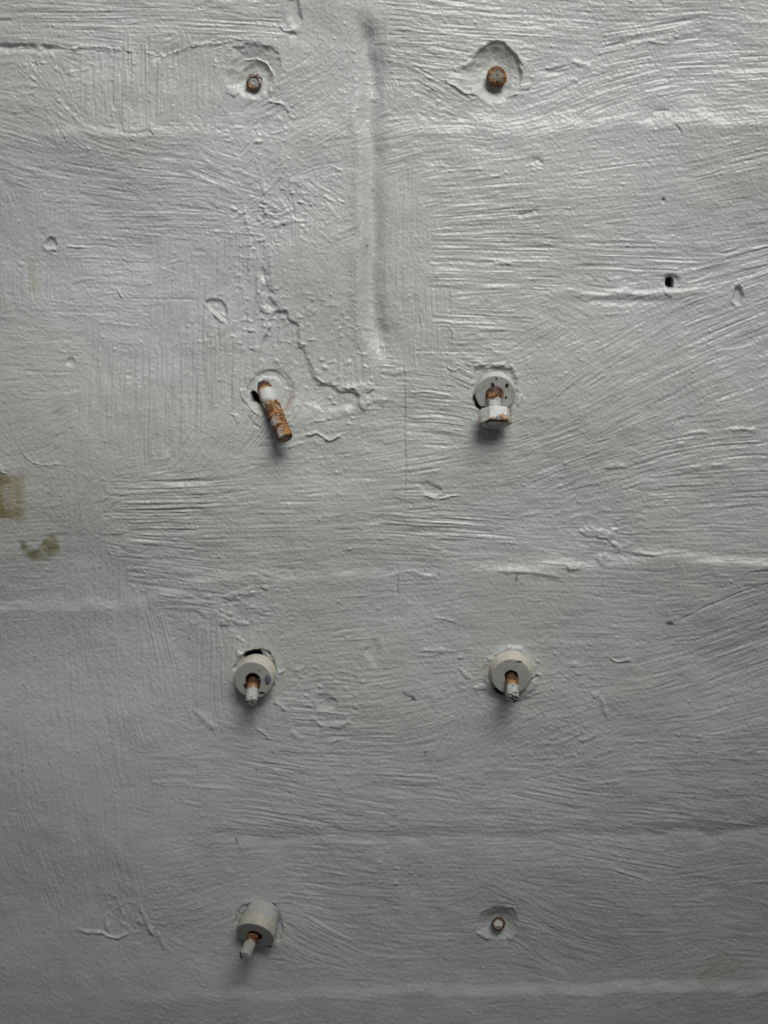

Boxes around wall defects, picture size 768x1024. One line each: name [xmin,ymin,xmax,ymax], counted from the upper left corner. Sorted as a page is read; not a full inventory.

damp [16,533,63,563]